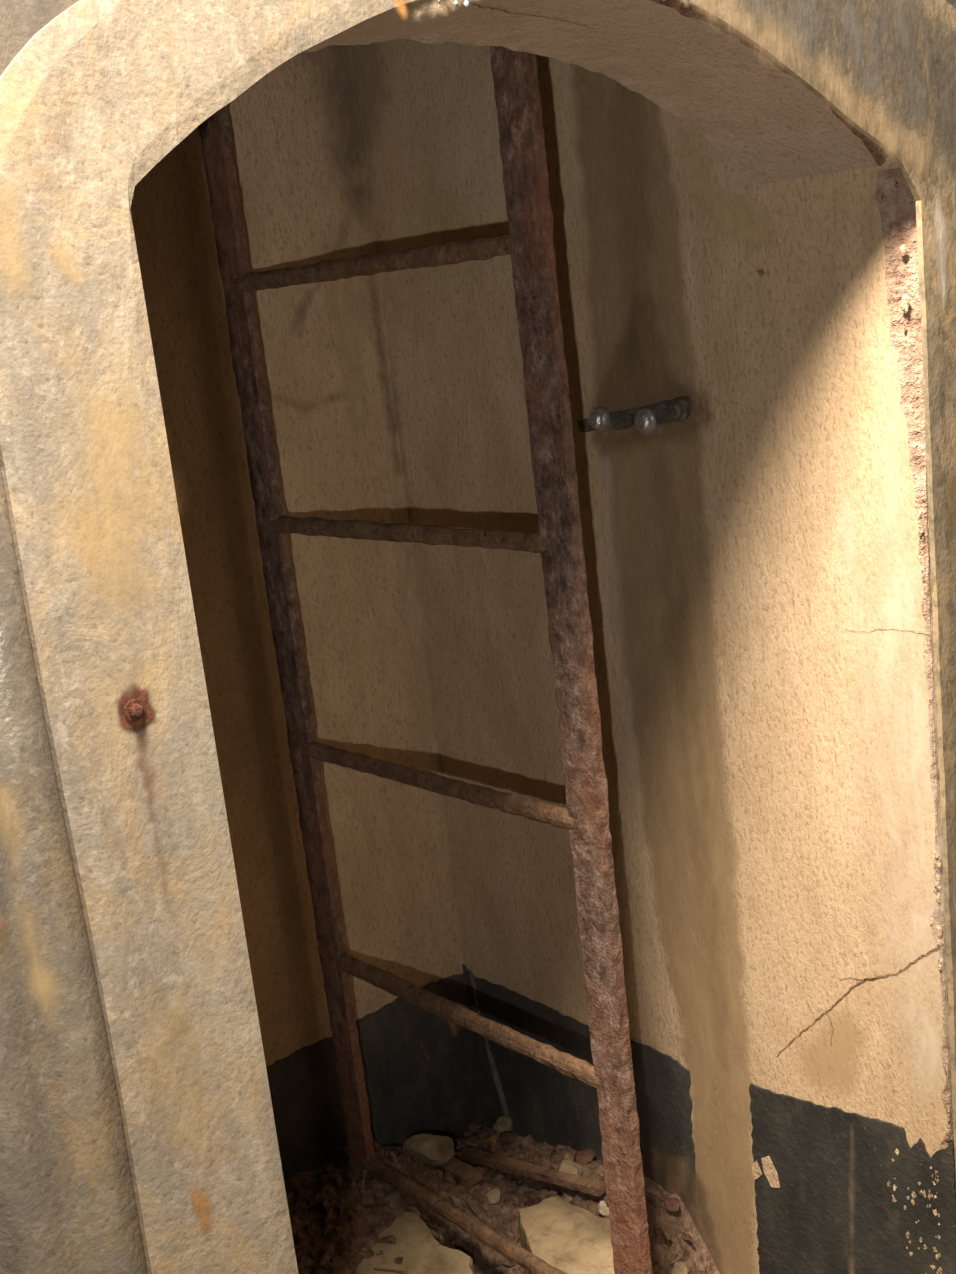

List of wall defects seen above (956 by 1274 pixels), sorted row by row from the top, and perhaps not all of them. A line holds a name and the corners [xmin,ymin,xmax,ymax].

corrosion [118,685,155,731]
water stain [575,65,752,1274]
crack [777,943,946,1056]
peeling [752,1156,780,1188]
peeling [887,1166,942,1274]